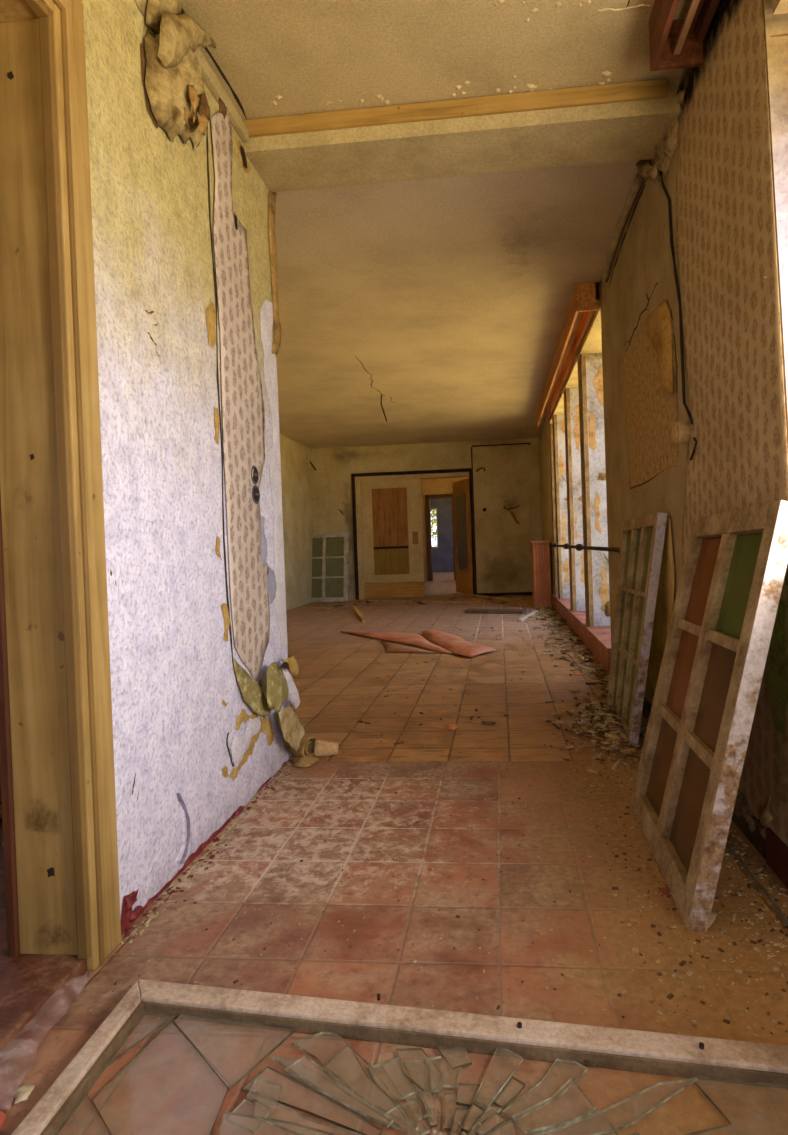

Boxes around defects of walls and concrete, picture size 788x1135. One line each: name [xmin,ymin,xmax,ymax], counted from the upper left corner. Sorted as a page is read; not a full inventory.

water stain [680,0,740,109]
flaking render [237,140,251,174]
crack [624,282,658,354]
flaking render [260,300,288,653]
peeling [222,708,274,781]